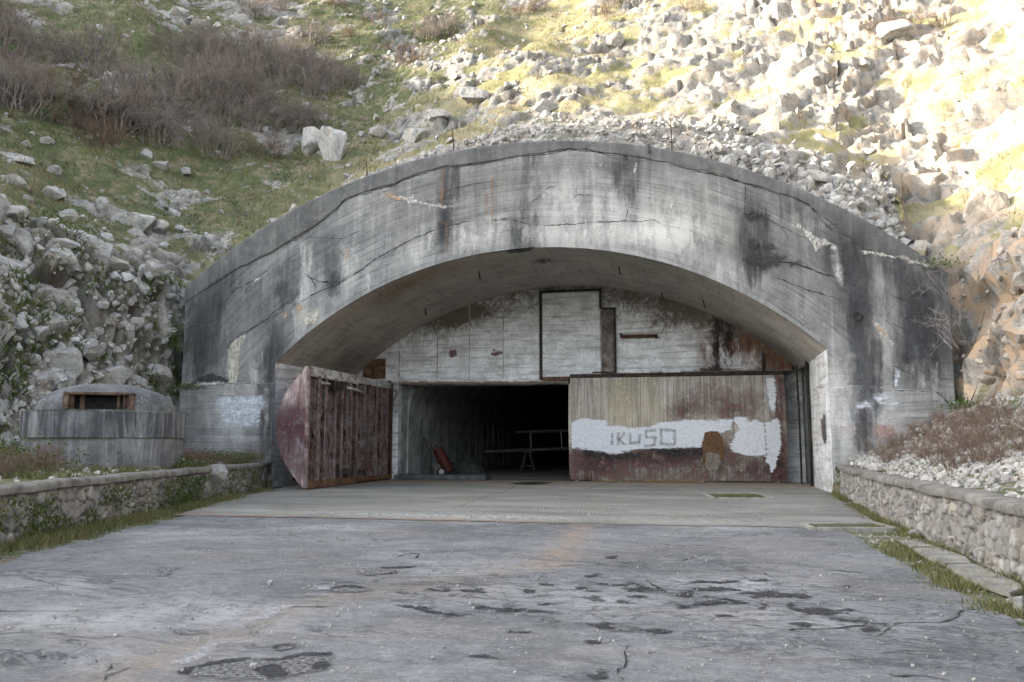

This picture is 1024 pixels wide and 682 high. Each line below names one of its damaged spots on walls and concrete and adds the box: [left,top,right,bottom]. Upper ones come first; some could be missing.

crack [184,143,938,392]
spalling [185,335,246,388]
corrosion [712,316,734,370]